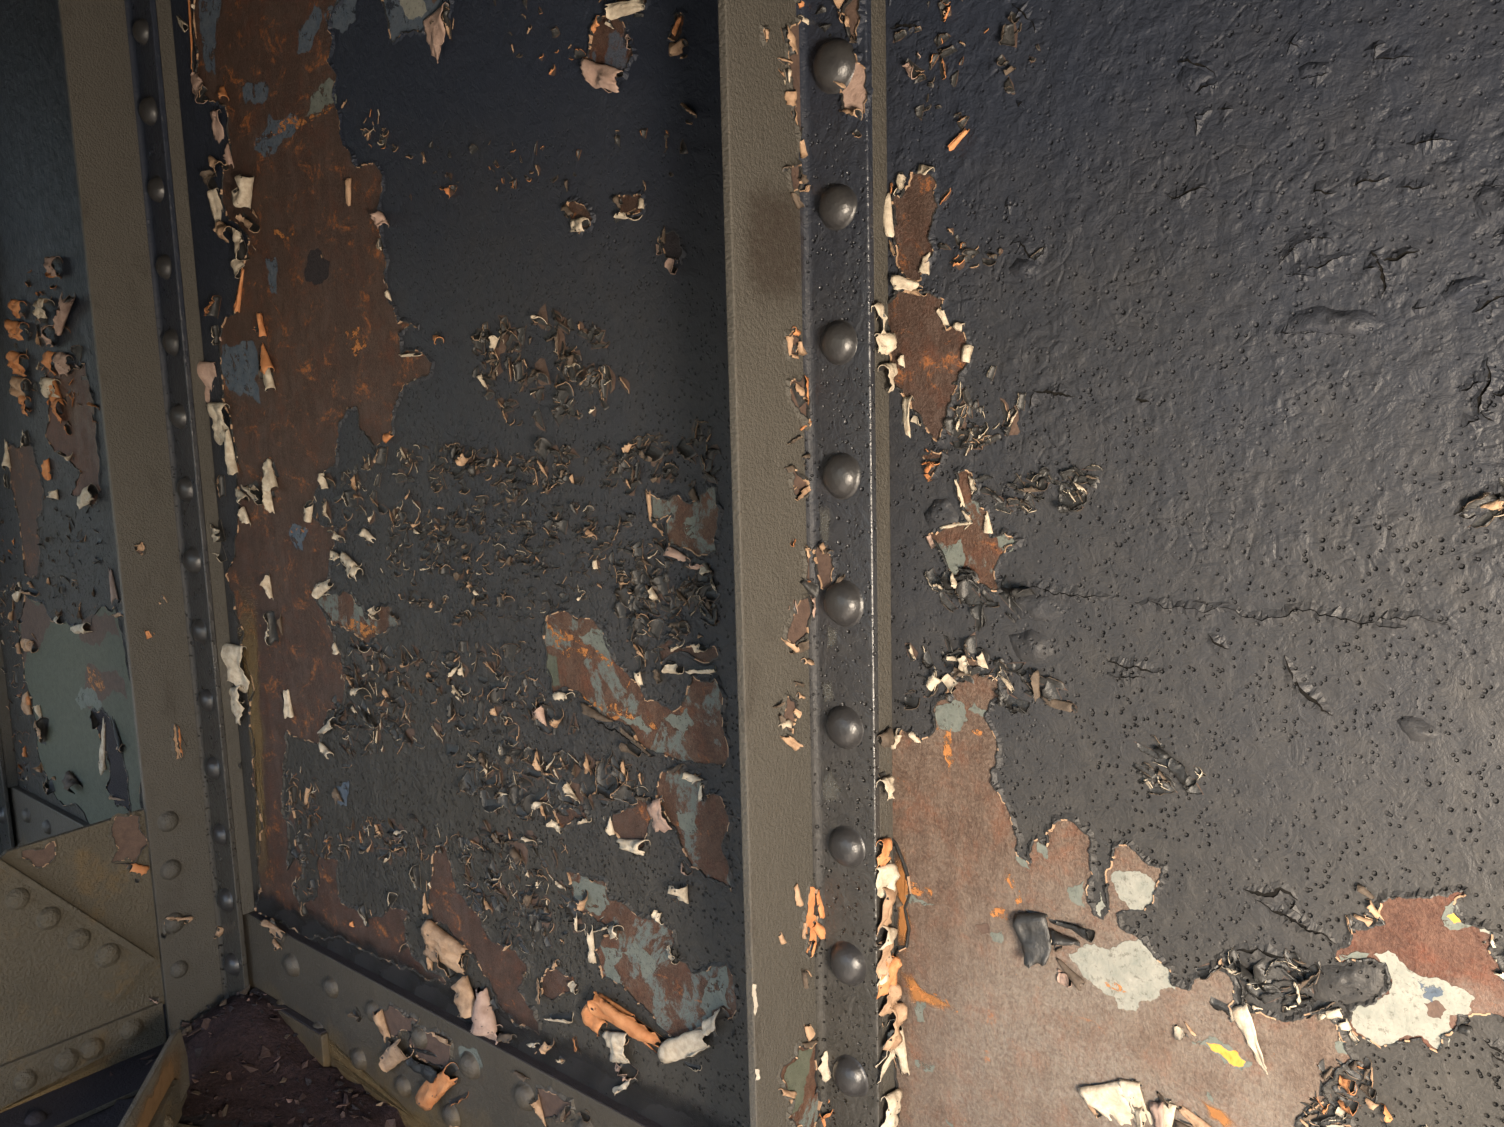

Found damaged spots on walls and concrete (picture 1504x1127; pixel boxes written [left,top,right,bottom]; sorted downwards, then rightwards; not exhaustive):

peeling [893,0,969,151]
peeling [983,11,1041,95]
peeling [0,256,150,883]
peeling [176,0,758,1111]
peeling [871,164,1504,1127]
crack [1011,579,1458,717]
peeling [161,916,194,939]
rust [896,866,910,941]
rust [908,979,946,1005]
peeling [336,1093,396,1127]
rust [1203,1102,1230,1127]